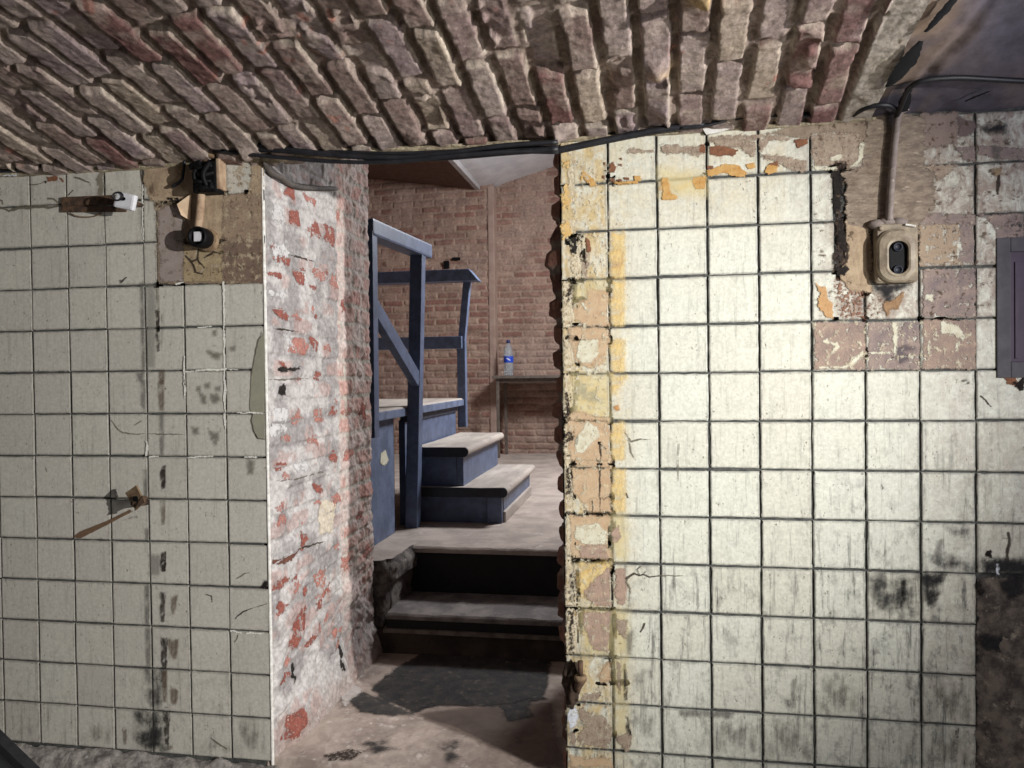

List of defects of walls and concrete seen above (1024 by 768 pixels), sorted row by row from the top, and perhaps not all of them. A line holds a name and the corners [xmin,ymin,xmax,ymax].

flaking render [143,162,346,313]
peeling [273,306,317,322]
peeling [279,336,331,368]
peeling [281,398,367,442]
peeling [307,435,355,463]
peeling [560,111,1024,768]
peeling [312,483,341,506]
crack [625,566,681,598]
damp [872,557,969,612]
peeling [272,568,342,685]
damp [124,609,171,748]
peeling [279,708,309,741]